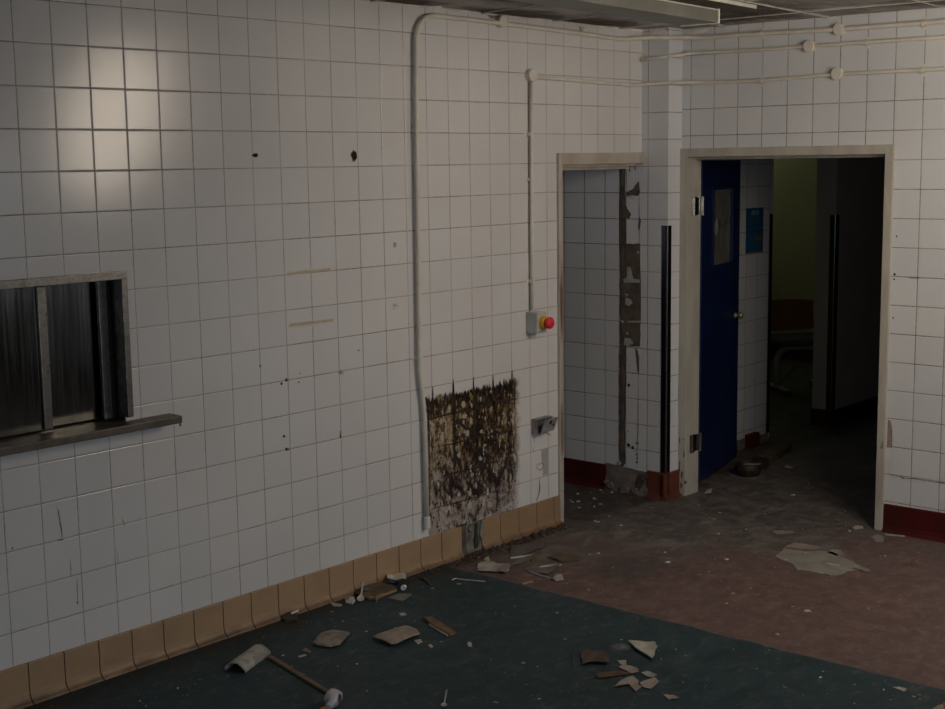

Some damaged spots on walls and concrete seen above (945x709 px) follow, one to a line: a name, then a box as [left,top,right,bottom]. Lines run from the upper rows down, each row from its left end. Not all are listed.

spalling [622,181,641,229]
spalling [621,243,641,376]
leakage [425,371,518,549]
peeling [605,463,649,497]